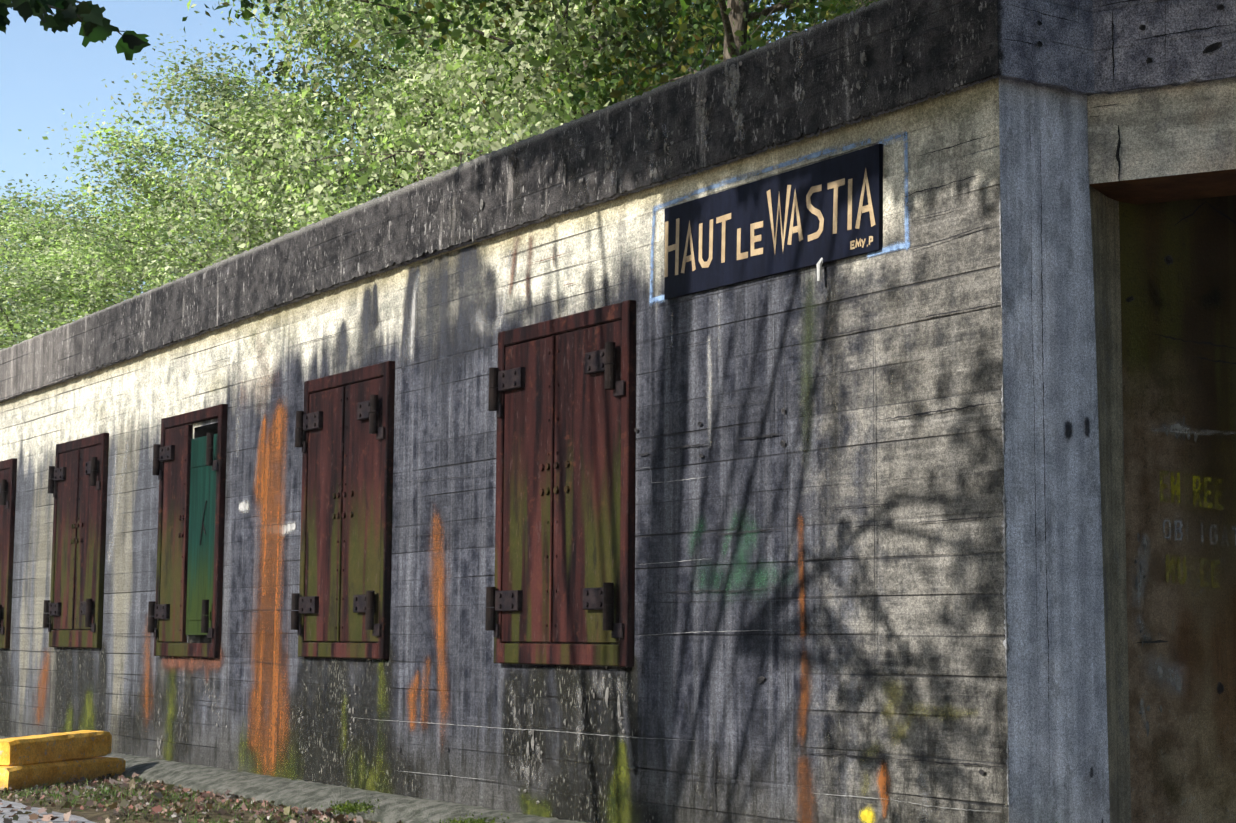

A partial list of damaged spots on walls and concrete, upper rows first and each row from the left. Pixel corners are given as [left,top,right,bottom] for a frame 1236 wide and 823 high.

crack [1004,0,1232,181]
corrosion [249,406,286,771]
corrosion [409,518,444,728]
corrosion [799,656,808,738]